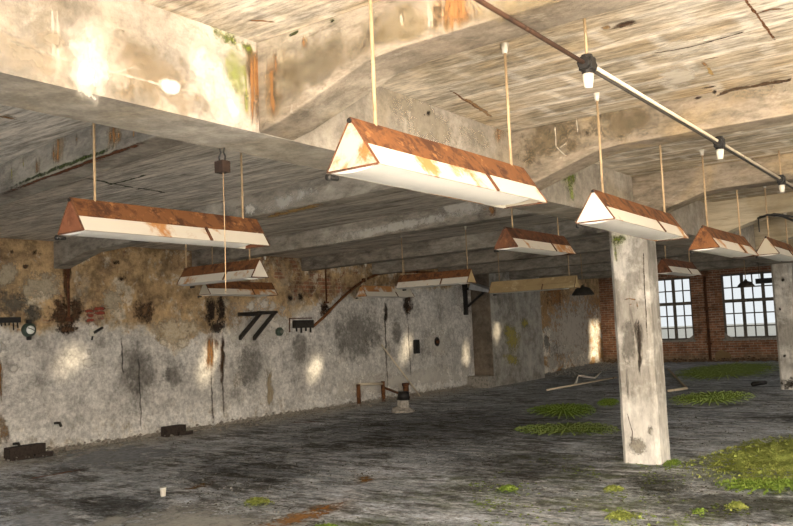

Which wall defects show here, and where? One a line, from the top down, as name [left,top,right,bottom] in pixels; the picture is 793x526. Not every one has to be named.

corrosion [444,0,468,28]
crack [745,0,784,39]
crack [655,32,743,60]
corrosion [250,54,259,119]
flaking render [83,306,105,326]
flaking render [224,299,289,347]
corrosion [206,335,225,382]
leakage [623,321,642,395]